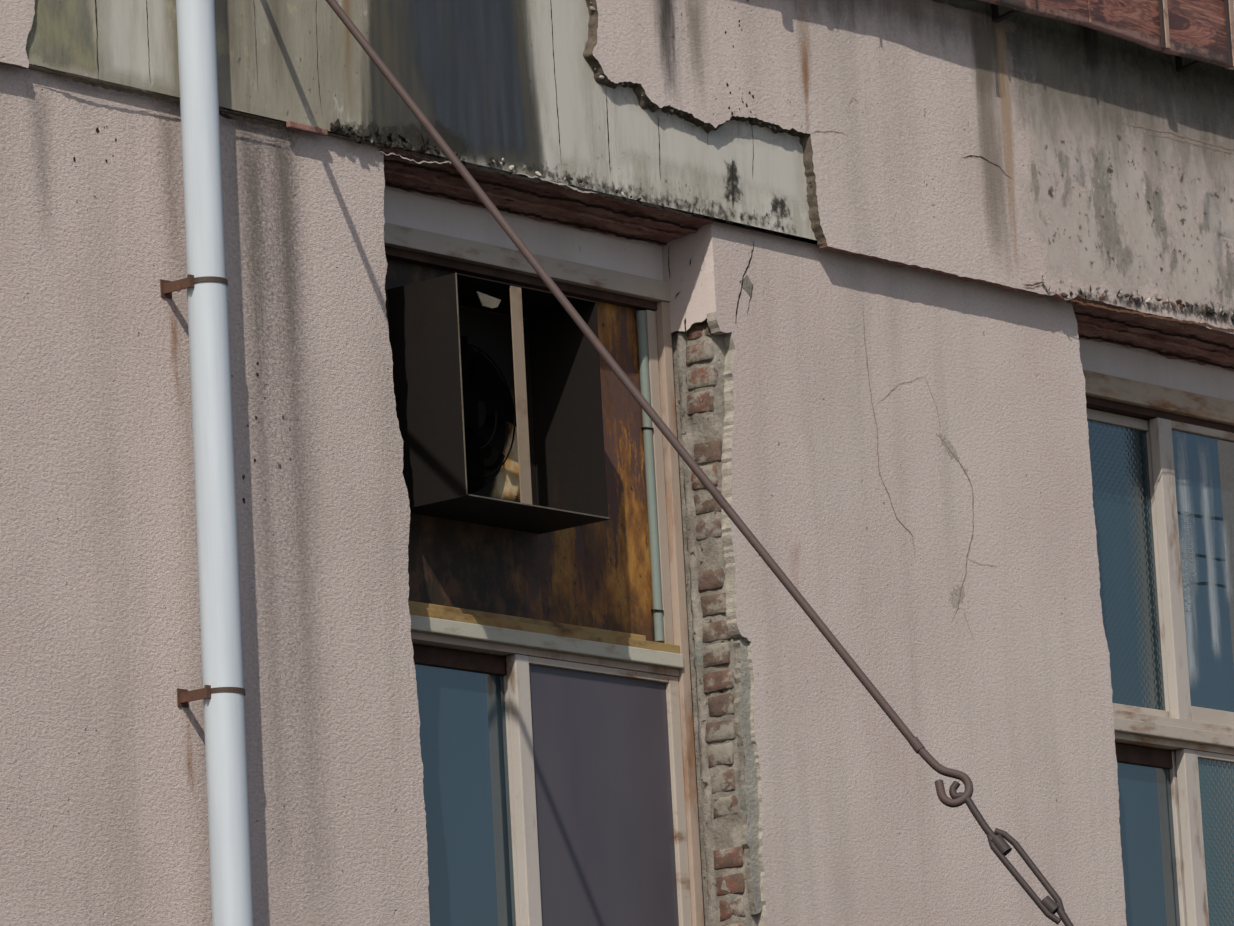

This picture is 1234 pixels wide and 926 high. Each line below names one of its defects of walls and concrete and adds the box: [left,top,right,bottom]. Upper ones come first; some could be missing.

spalling [25,0,180,102]
spalling [214,0,826,245]
water stain [335,0,795,232]
water stain [977,21,1234,191]
crack [735,240,755,324]
crack [863,315,996,634]
spalling [671,323,763,926]